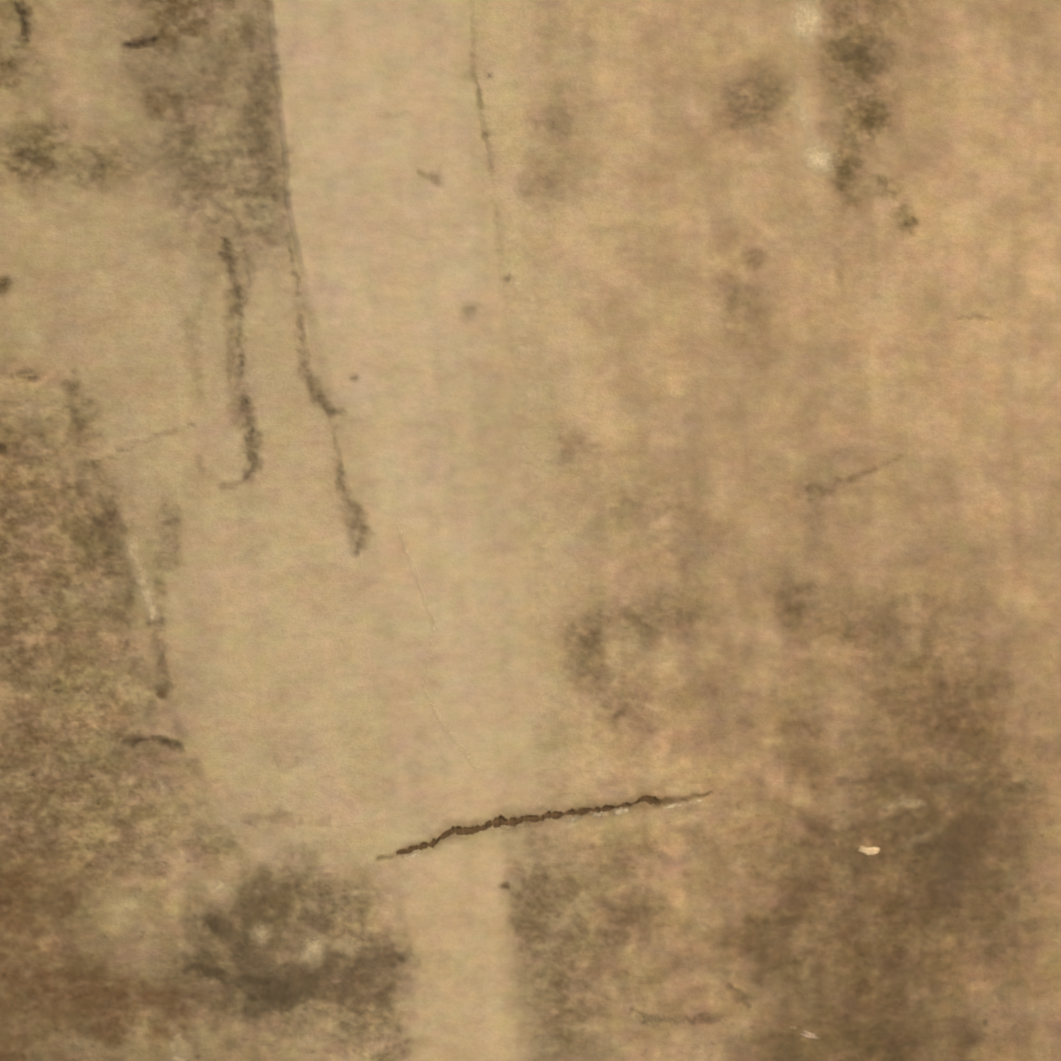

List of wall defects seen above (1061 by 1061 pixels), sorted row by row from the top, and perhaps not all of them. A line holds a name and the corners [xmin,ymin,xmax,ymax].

leakage [129,540,155,620]
crack [394,790,706,860]
leakage [186,878,400,1035]